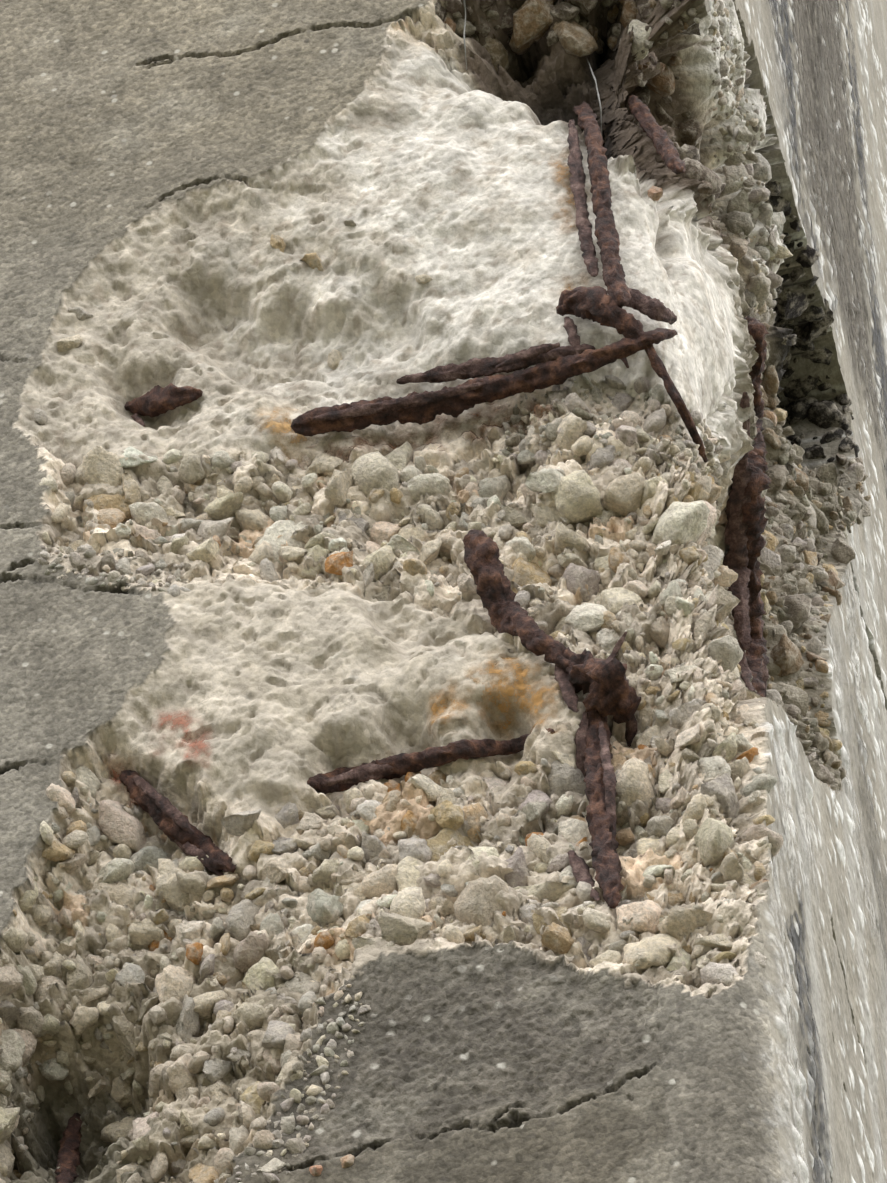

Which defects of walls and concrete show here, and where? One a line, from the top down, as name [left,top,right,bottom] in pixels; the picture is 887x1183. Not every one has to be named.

crack [135,8,411,70]
rust [626,287,677,325]
rust [313,316,596,421]
crack [0,559,151,598]
rust [723,452,769,697]
crack [0,759,53,775]
rust [431,631,641,837]
spalling [761,600,847,798]
spalling [99,799,147,855]
spalling [88,844,171,920]
spalling [247,790,411,950]
crack [275,1062,657,1175]